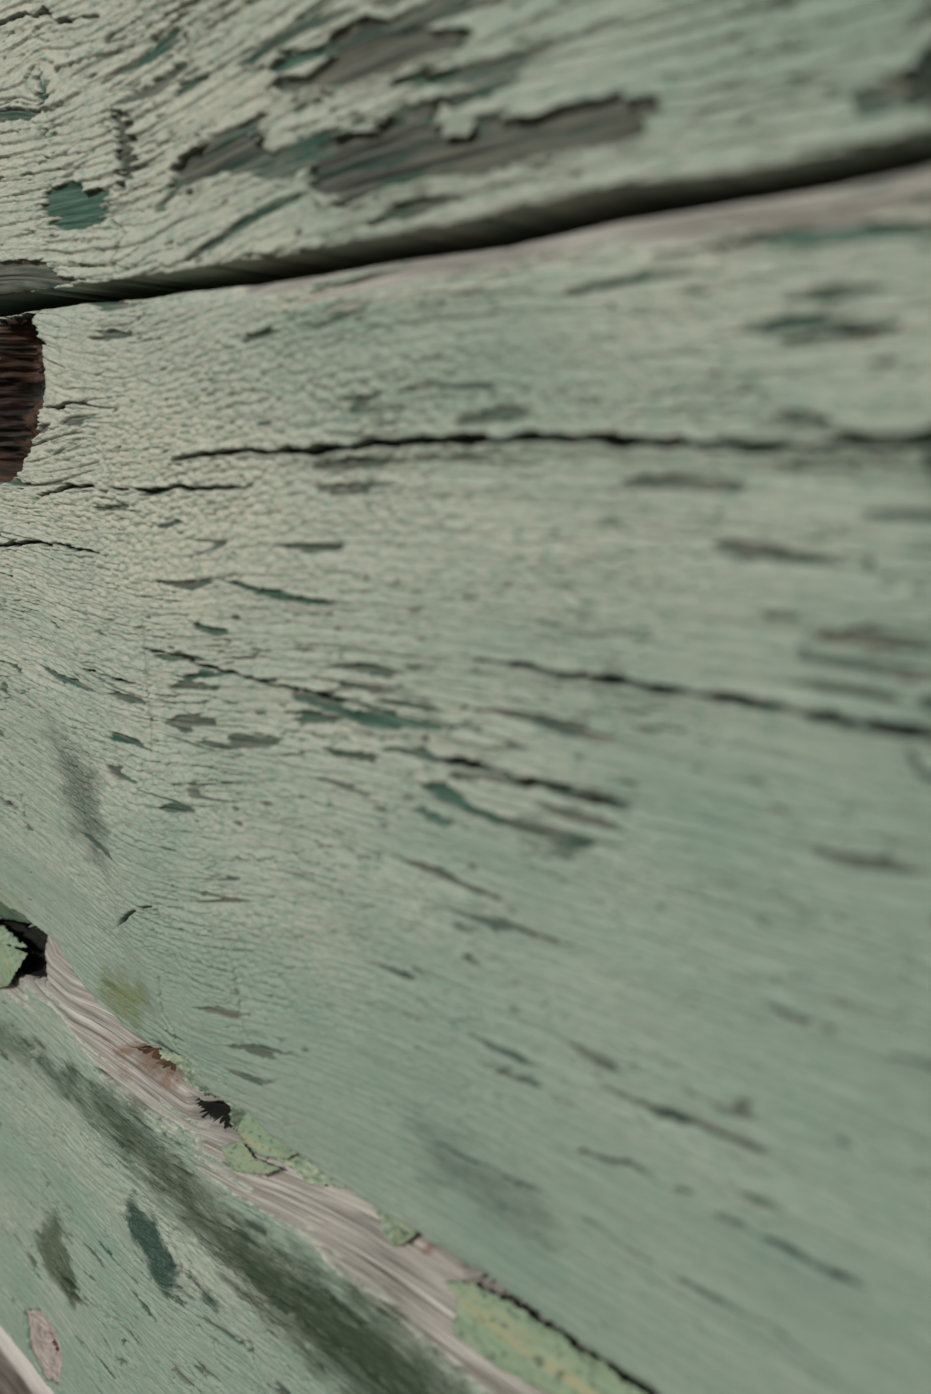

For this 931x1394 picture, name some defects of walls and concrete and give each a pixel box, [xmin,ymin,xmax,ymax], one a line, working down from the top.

crack [1,8,88,26]
peeling [271,19,474,93]
peeling [313,96,658,208]
peeling [735,223,931,247]
crack [44,433,931,496]
crack [0,540,99,553]
crack [154,650,396,714]
crack [481,659,931,739]
crack [417,722,624,805]
peeling [0,902,31,988]
peeling [158,1049,350,1190]
peeling [444,1280,647,1394]